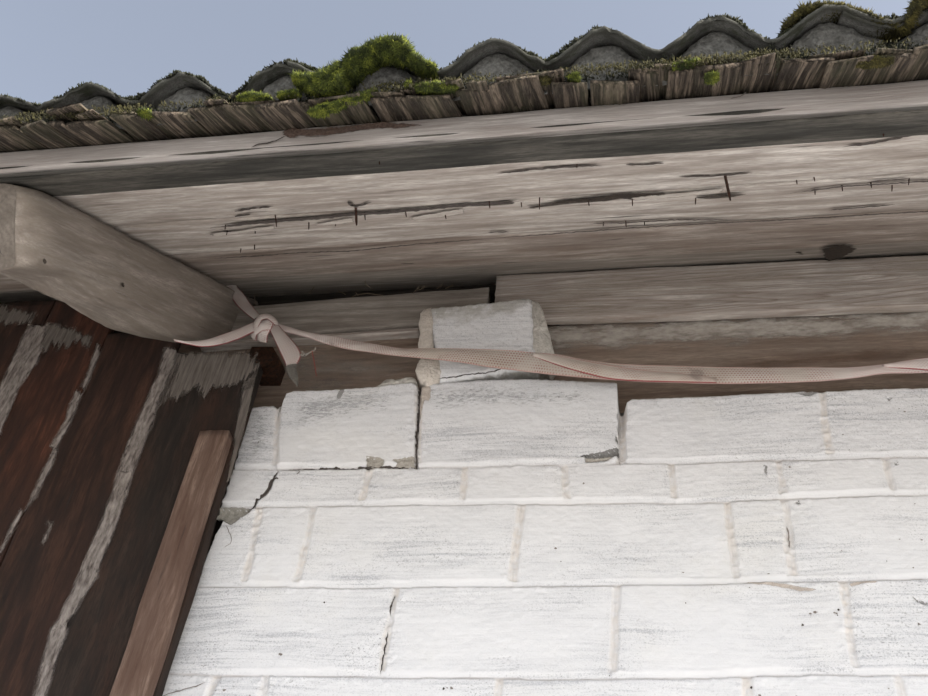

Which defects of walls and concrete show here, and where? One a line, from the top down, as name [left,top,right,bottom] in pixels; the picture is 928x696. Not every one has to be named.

crack [246,369,501,515]
crack [380,597,395,674]